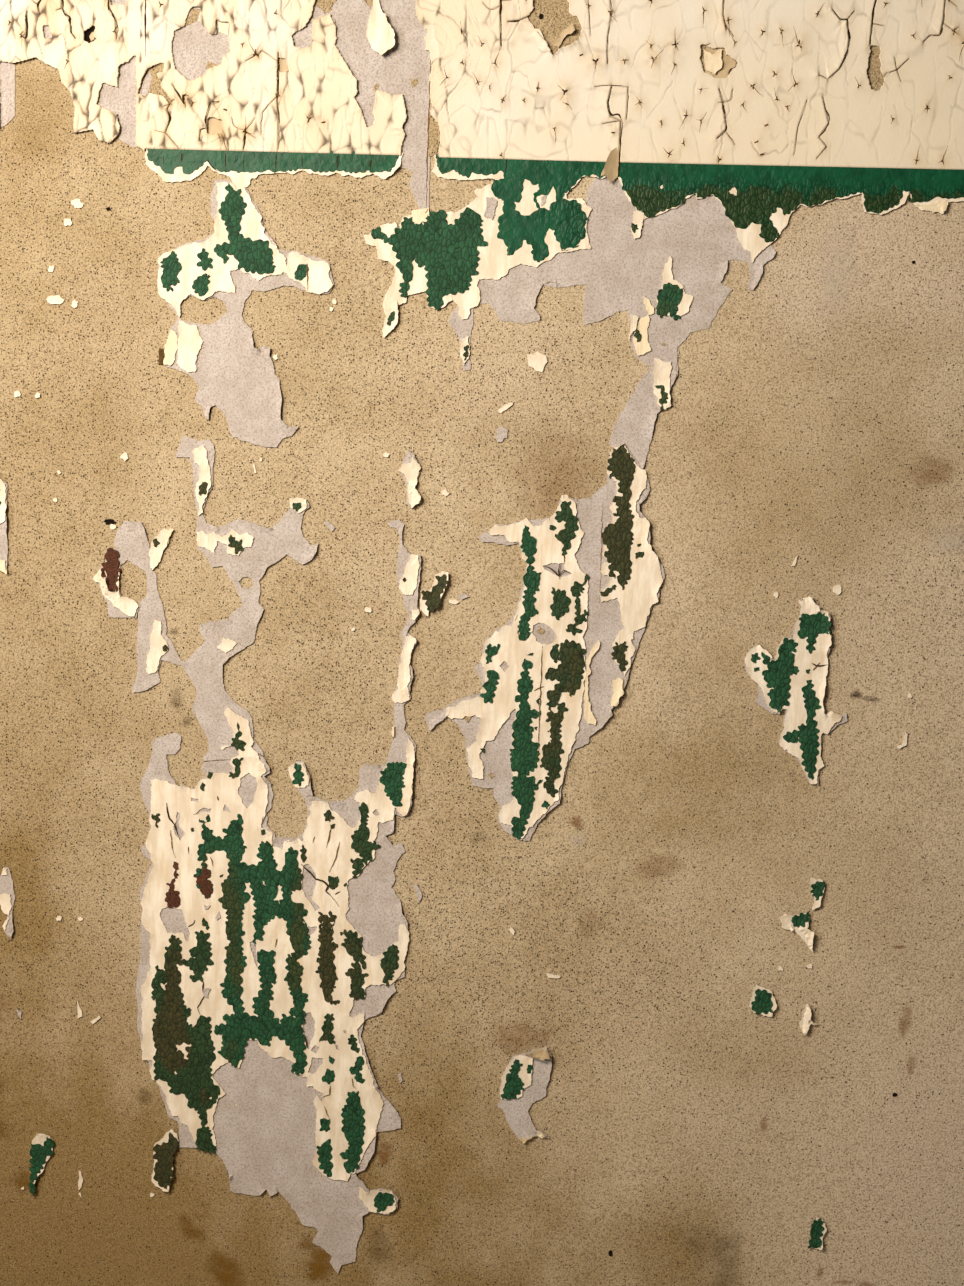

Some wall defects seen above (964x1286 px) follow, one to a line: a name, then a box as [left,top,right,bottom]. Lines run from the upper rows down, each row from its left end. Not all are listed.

crack [8,0,75,69]
crack [108,0,163,57]
crack [156,40,326,148]
crack [440,0,964,170]
peeling [0,0,964,841]
peeling [93,436,470,1273]
peeling [779,877,825,968]
peeling [497,1047,552,1144]